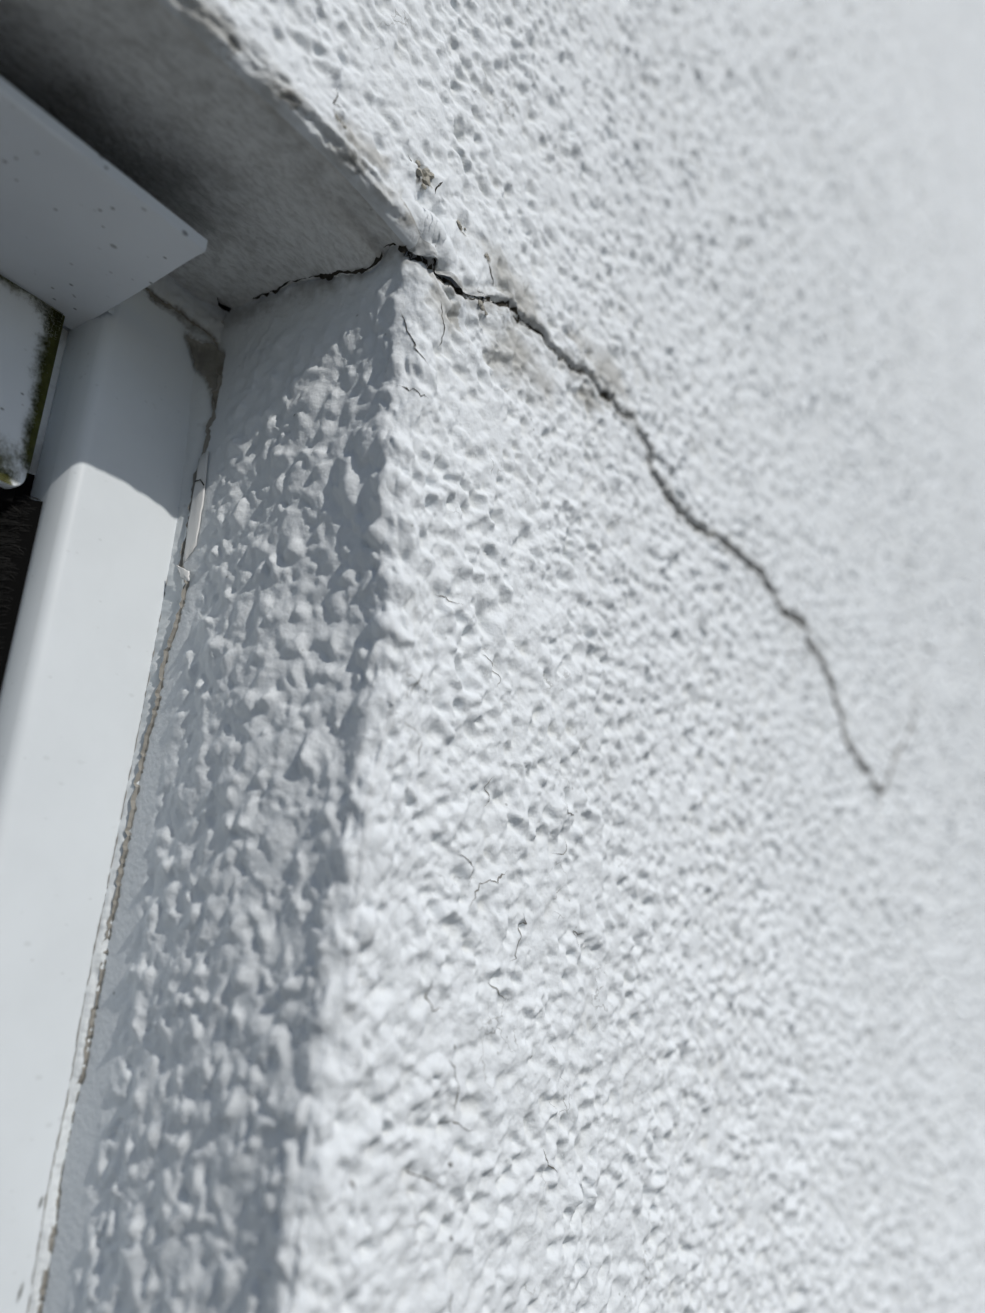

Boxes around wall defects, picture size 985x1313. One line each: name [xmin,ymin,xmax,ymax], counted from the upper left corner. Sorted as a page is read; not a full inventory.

crack [253,243,934,795]